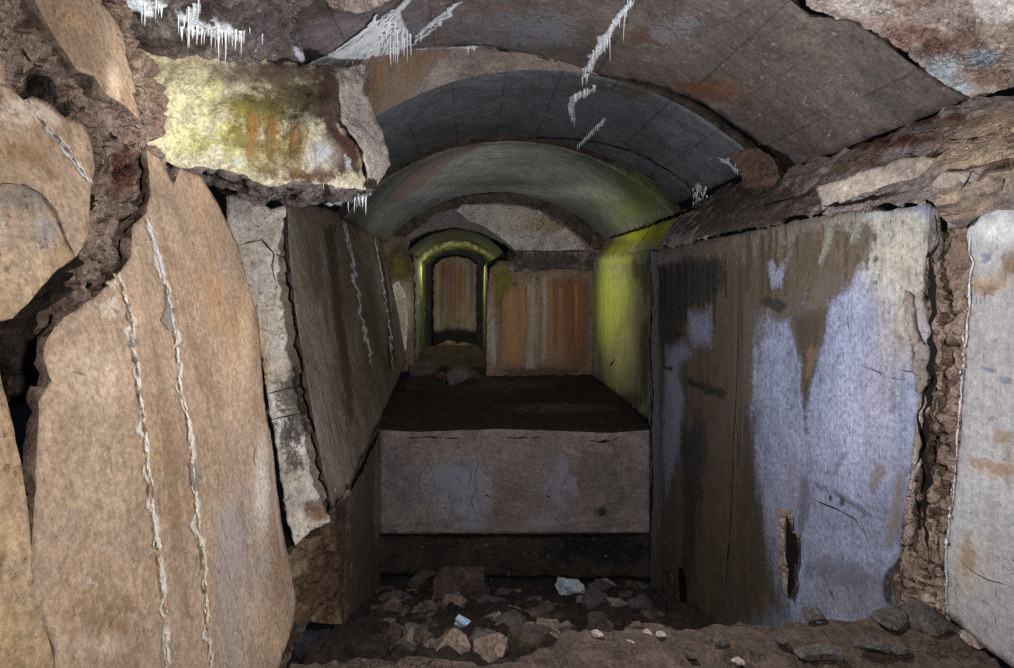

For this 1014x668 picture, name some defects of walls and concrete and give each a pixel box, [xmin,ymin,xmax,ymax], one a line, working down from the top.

damp [124,0,167,24]
damp [177,0,263,62]
damp [293,0,463,97]
damp [568,0,634,122]
rust [246,112,278,159]
damp [316,119,360,173]
damp [599,224,877,623]
crack [862,200,1006,623]
spalling [778,508,800,598]